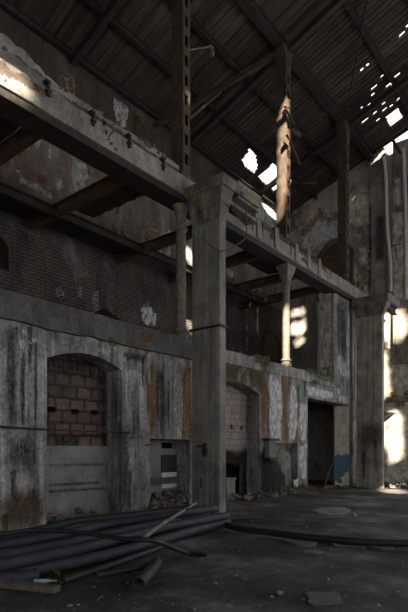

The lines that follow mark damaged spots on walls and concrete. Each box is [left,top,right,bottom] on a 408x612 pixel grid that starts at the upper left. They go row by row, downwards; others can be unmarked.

spalling [0,33,188,175]
flaking render [254,204,338,271]
damp [8,326,42,424]
corrosion [281,376,291,442]